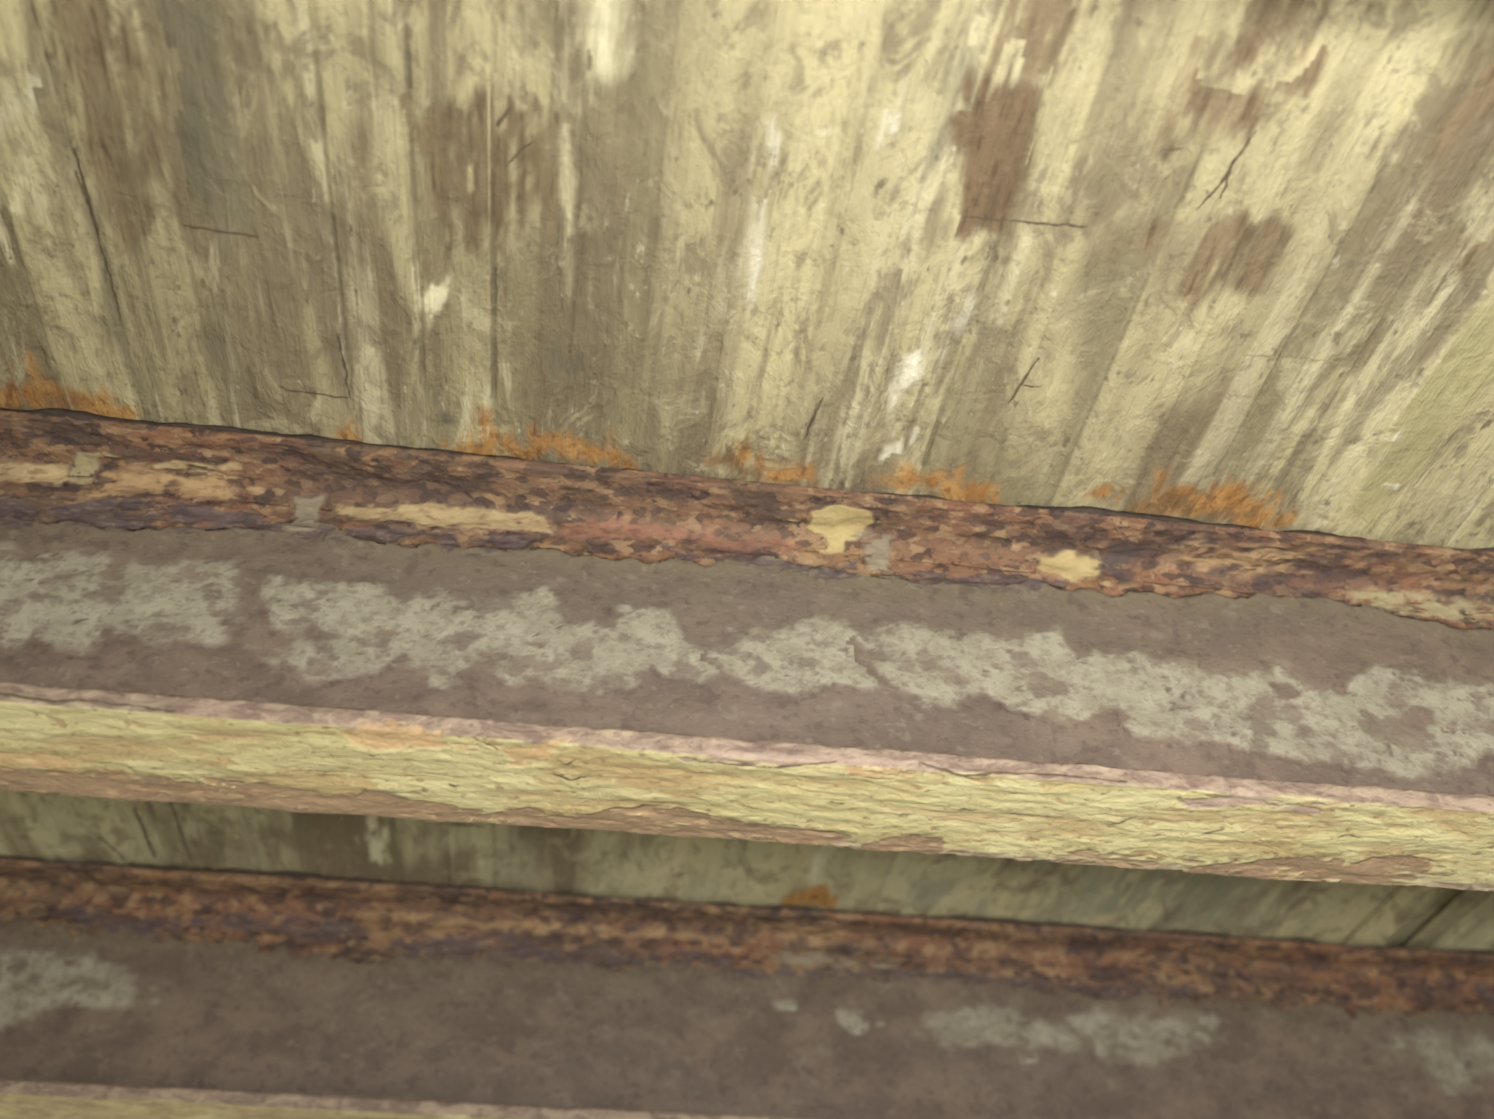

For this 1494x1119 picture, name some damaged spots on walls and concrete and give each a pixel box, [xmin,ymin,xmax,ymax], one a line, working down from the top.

damp [20,0,267,422]
damp [374,0,559,316]
damp [886,0,1110,273]
damp [1083,0,1424,323]
damp [1394,0,1494,203]
rust [0,340,160,421]
rust [0,448,267,504]
rust [281,428,1017,575]
rust [1031,454,1329,590]
damp [1328,205,1494,539]
rust [1343,576,1494,628]
rust [356,880,916,972]